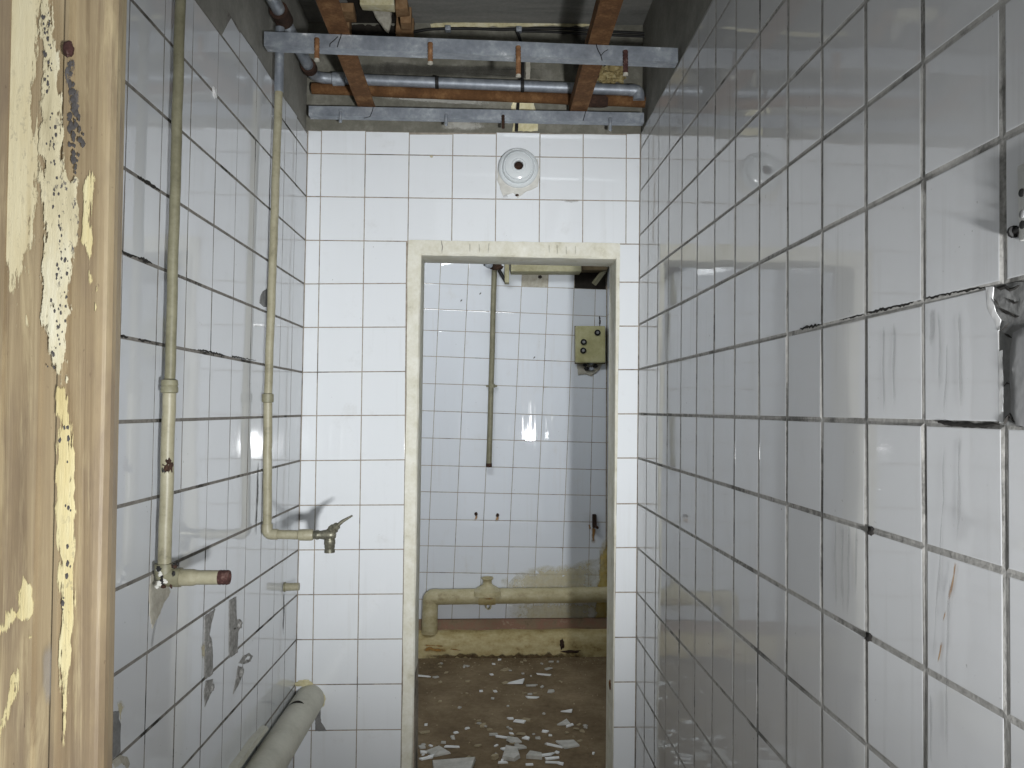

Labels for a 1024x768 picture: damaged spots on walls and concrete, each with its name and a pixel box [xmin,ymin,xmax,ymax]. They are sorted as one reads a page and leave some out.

spalling [340,0,415,37]
peeling [588,94,608,108]
peeling [6,0,98,746]
spalling [986,282,1024,428]
spalling [204,609,215,706]
spalling [228,597,253,694]
water stain [527,602,607,618]
water stain [598,549,607,587]